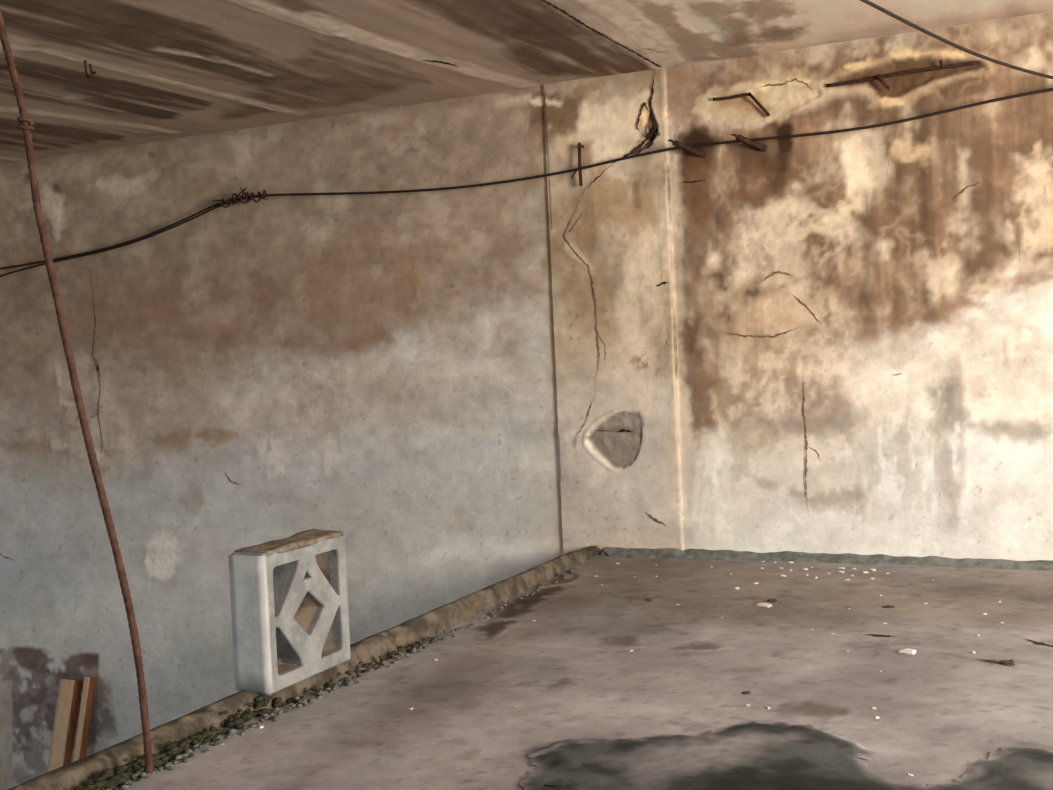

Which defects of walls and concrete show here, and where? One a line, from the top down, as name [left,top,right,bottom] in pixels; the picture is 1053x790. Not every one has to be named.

crack [90,266,108,473]
leakage [0,0,1053,549]
flaking render [549,86,662,169]
crack [541,0,739,435]
crack [802,372,821,517]
peeling [0,643,123,785]